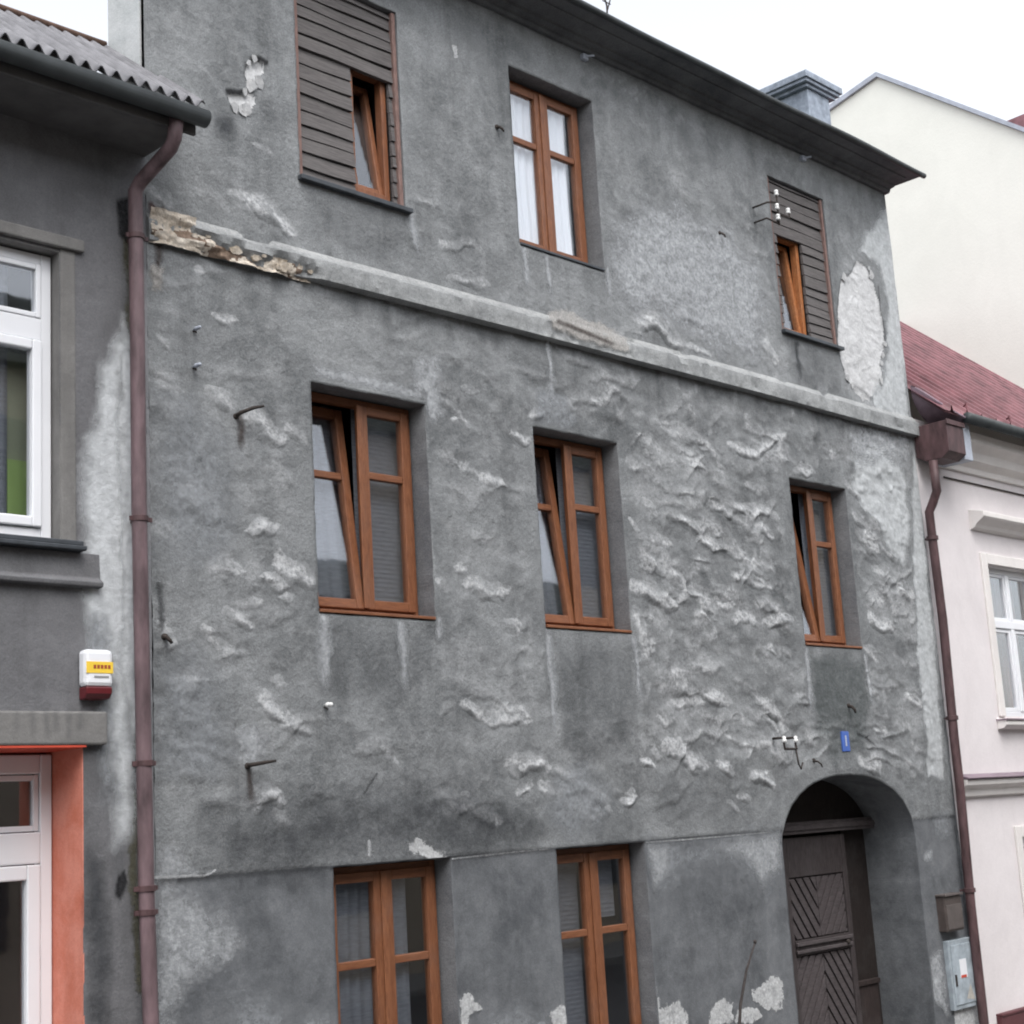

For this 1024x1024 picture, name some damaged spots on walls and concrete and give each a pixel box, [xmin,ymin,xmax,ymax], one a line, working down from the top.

flaking render [227,55,264,117]
flaking render [149,203,313,283]
flaking render [838,261,887,403]
leakage [82,323,142,993]